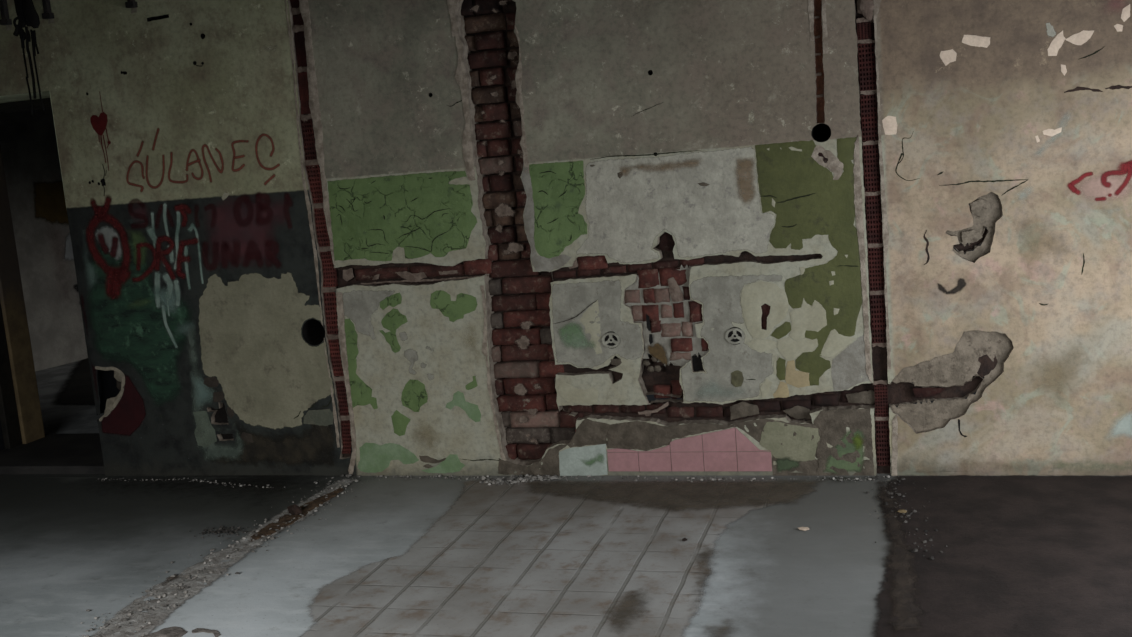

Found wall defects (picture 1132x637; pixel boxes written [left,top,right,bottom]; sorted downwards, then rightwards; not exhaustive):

peeling [327,171,477,261]
peeling [430,290,478,322]
flaking render [529,123,870,404]
spalling [95,366,125,421]
flaking render [186,272,334,460]
peeling [344,318,378,409]
peeling [358,292,466,473]
peeling [446,376,481,422]
flaking render [498,408,875,476]
spalling [890,330,1014,437]